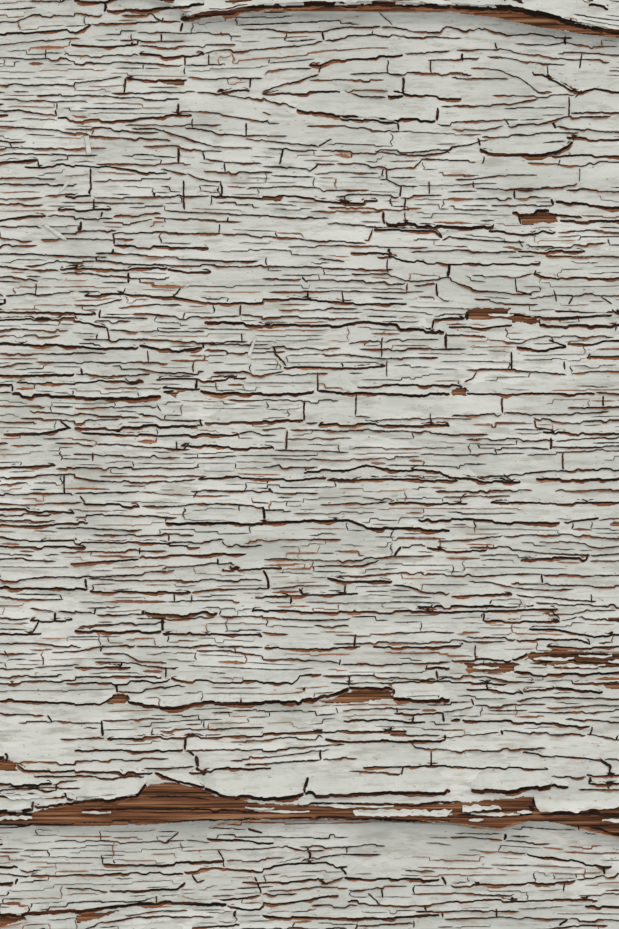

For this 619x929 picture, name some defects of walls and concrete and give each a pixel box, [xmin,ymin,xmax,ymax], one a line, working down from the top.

peeling [74,0,619,38]
crack [0,0,619,391]
peeling [350,193,619,282]
peeling [0,299,204,353]
peeling [60,263,619,360]
peeling [0,505,282,572]
crack [0,381,619,754]
peeling [521,553,588,563]
crack [0,722,357,801]
crack [351,769,401,777]
crack [551,776,619,792]
crack [0,794,619,929]